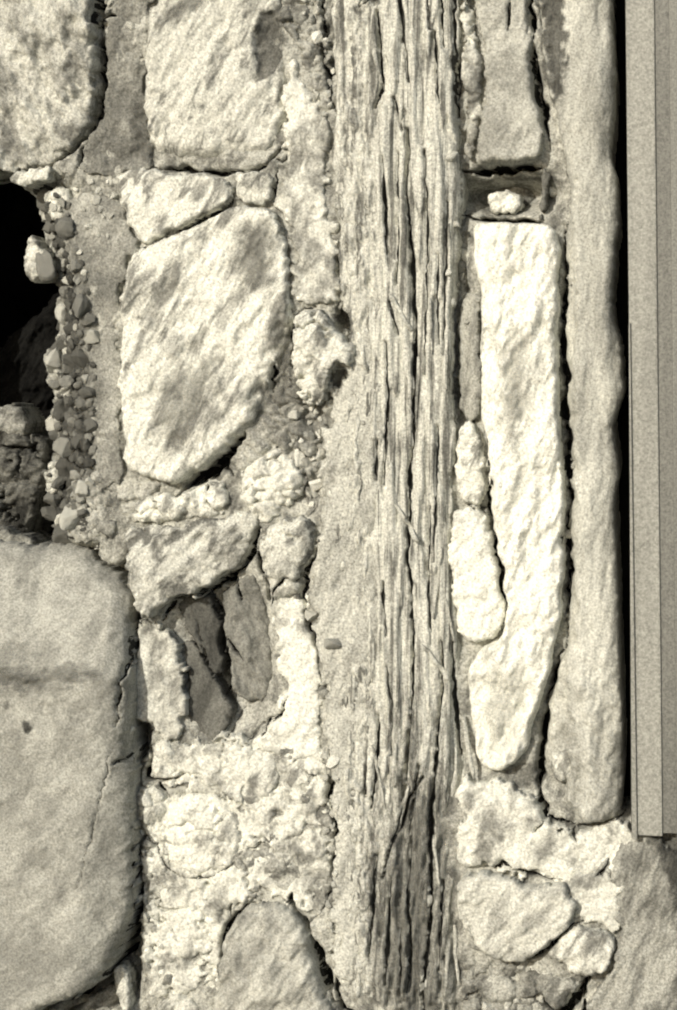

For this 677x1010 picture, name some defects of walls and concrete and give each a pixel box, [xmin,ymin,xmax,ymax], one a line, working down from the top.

crack [177,437,246,497]
crack [116,523,318,741]
crack [75,742,178,889]
crack [289,781,353,1010]
crack [495,860,563,880]